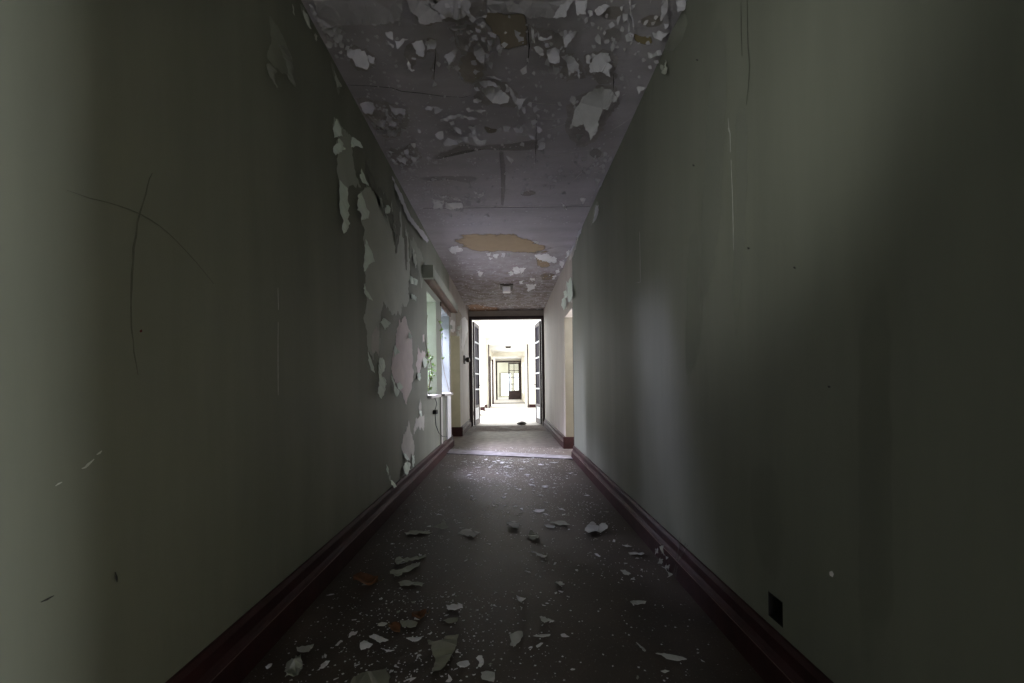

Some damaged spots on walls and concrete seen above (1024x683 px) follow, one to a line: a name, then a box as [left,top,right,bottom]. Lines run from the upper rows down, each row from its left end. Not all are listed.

peeling [344,45,376,72]
peeling [385,0,620,150]
peeling [648,0,686,75]
crack [67,173,214,374]
peeling [333,97,428,475]
damp [455,234,550,267]
peeling [486,252,536,292]
peeling [533,178,603,310]